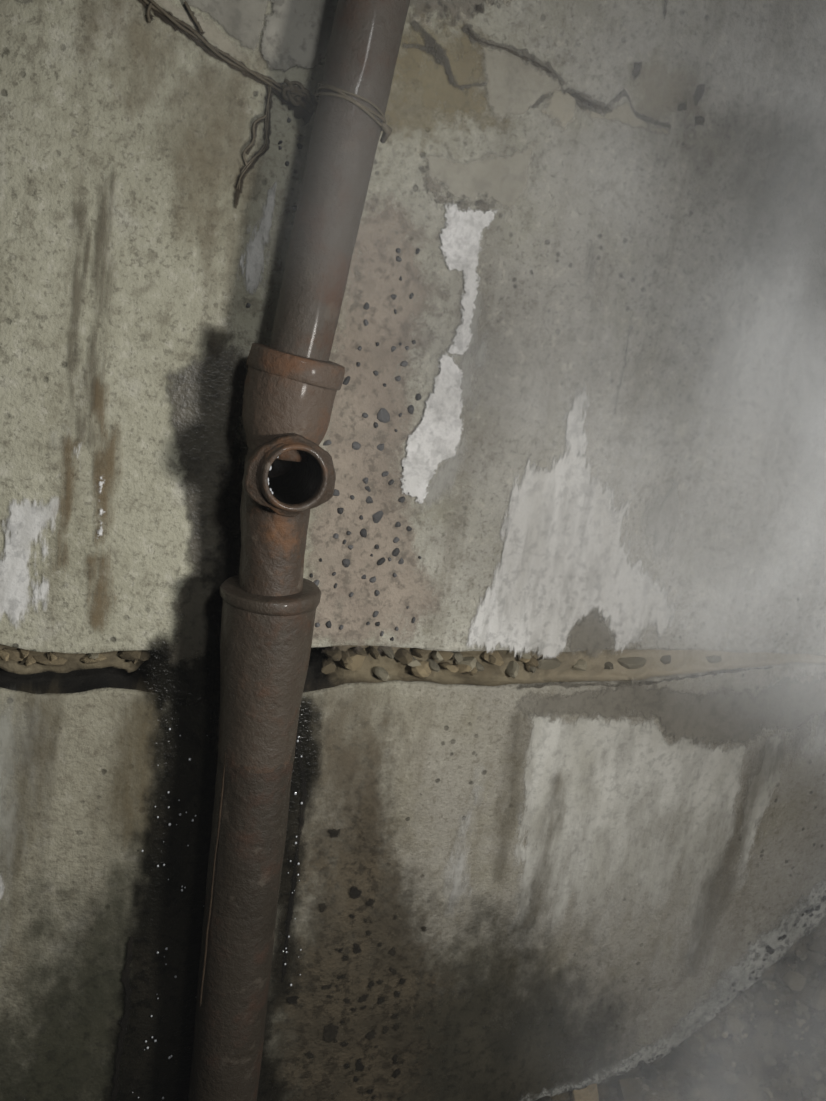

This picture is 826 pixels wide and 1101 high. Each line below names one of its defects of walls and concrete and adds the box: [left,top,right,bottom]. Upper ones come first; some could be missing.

crack [403,20,671,129]
water stain [69,198,107,391]
rust [62,439,74,521]
rust [89,557,109,628]
rust [94,382,116,520]
water stain [0,333,248,1101]
spalling [309,166,496,645]
peeling [467,387,677,658]
water stain [567,609,614,657]
crack [519,667,770,689]
water stain [257,697,322,1101]
water stain [387,672,826,1101]